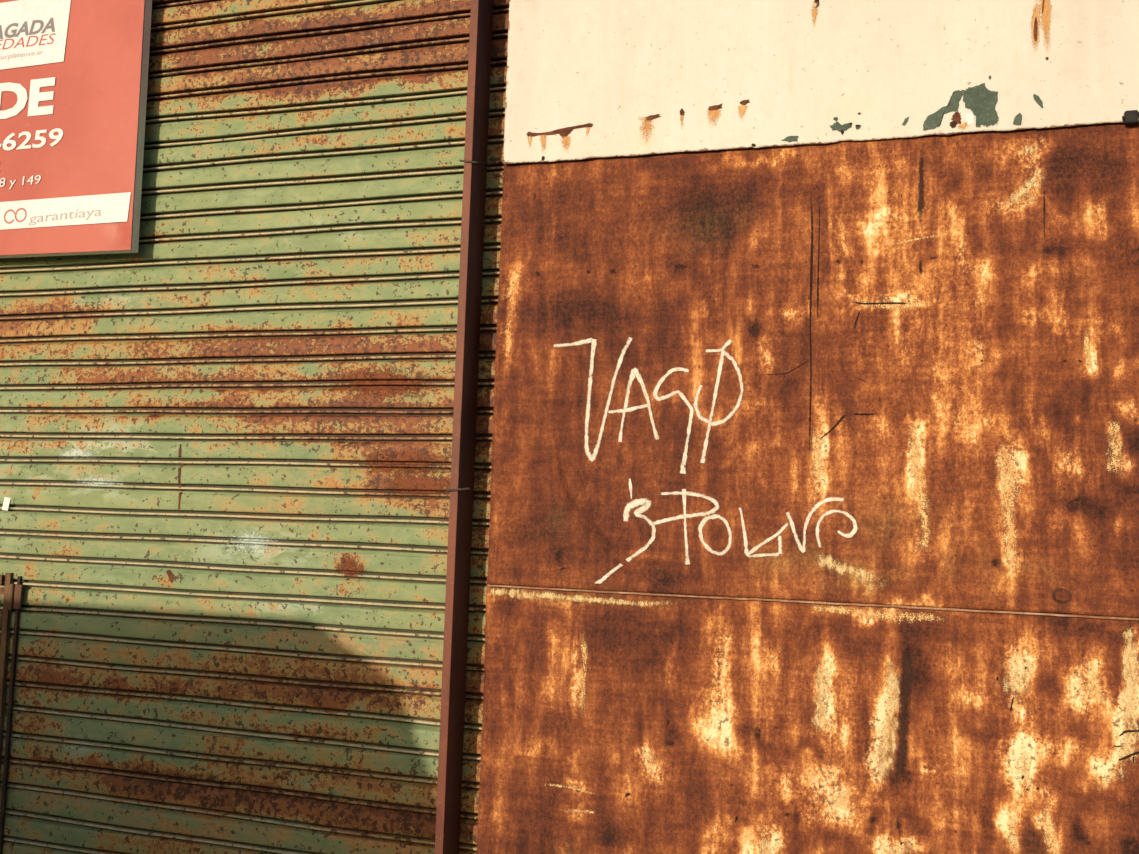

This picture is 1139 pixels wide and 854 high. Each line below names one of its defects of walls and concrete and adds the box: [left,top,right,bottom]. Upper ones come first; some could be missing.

rust [1031,0,1051,60]
rust [527,123,593,161]
rust [639,114,661,138]
rust [708,103,723,124]
peeling [923,76,999,131]
rust [328,362,439,416]
rust [349,443,451,525]